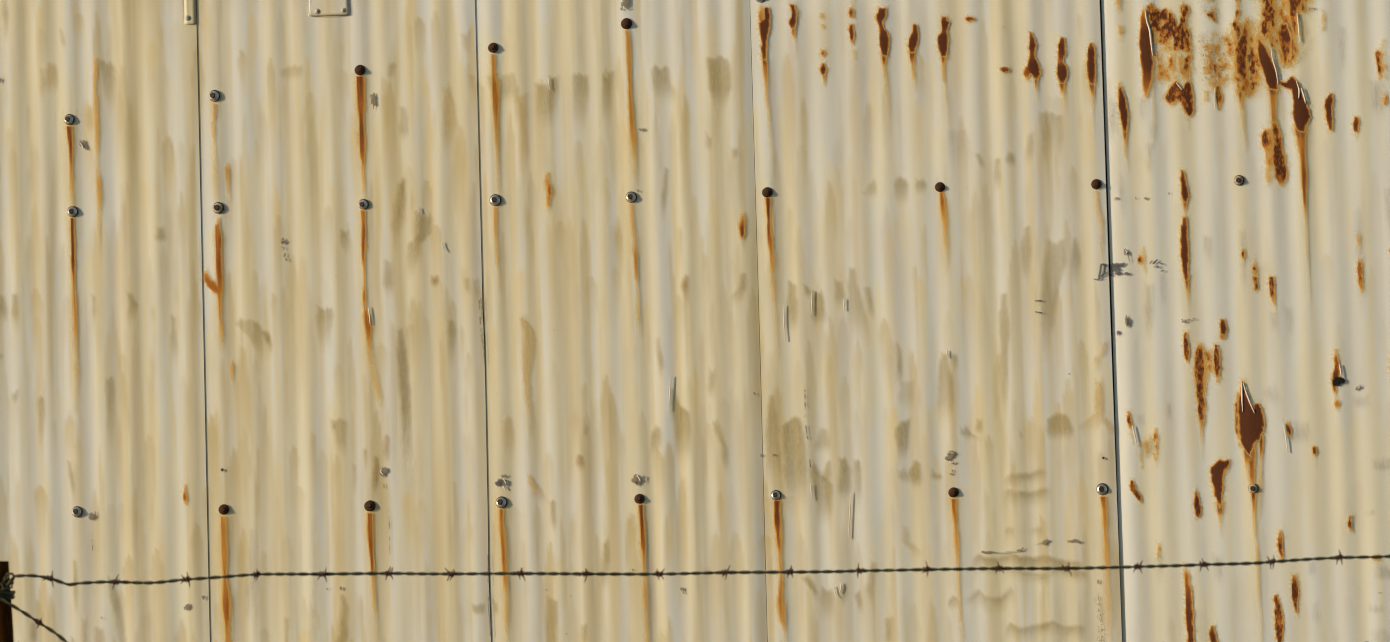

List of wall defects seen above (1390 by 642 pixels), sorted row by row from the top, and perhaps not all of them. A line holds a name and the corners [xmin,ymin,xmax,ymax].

corrosion [875,7,890,78]
corrosion [907,23,919,78]
corrosion [937,16,975,82]
corrosion [1000,31,1068,94]
corrosion [1086,42,1096,104]
corrosion [356,75,366,190]
corrosion [1117,0,1333,264]
corrosion [203,218,224,339]
corrosion [1180,169,1190,294]
corrosion [1182,319,1227,438]
corrosion [1193,380,1299,642]
corrosion [1183,567,1218,642]